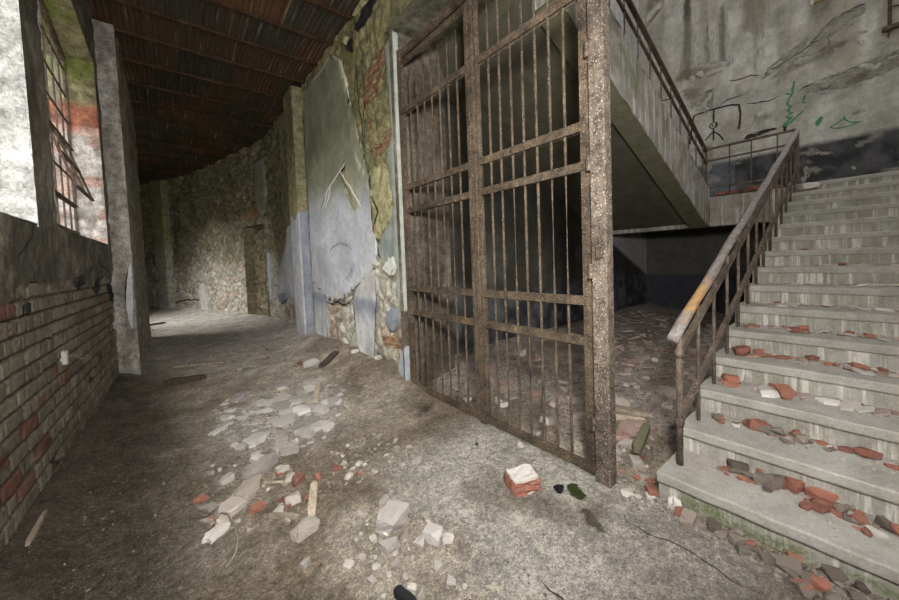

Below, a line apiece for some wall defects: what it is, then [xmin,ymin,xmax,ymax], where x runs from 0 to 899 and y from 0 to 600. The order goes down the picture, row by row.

water stain [677,0,734,81]
crack [722,75,778,104]
spalling [763,2,866,80]
spalling [798,51,899,93]
peeling [267,0,411,381]